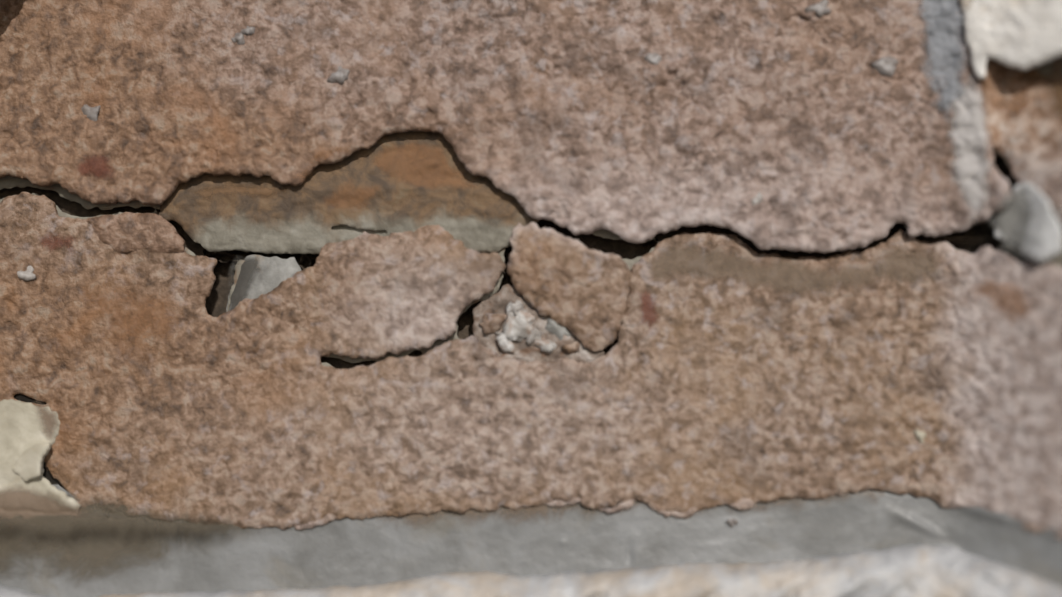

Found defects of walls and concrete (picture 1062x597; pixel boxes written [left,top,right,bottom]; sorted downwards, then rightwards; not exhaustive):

spalling [961,0,1062,264]
crack [993,154,1019,192]
crack [0,186,319,317]
spalling [158,131,540,312]
crack [537,217,1004,259]
crack [321,356,377,369]
crack [408,349,423,357]
crack [457,246,513,339]
spalling [472,284,605,363]
crack [603,334,618,355]
peeling [0,399,81,525]